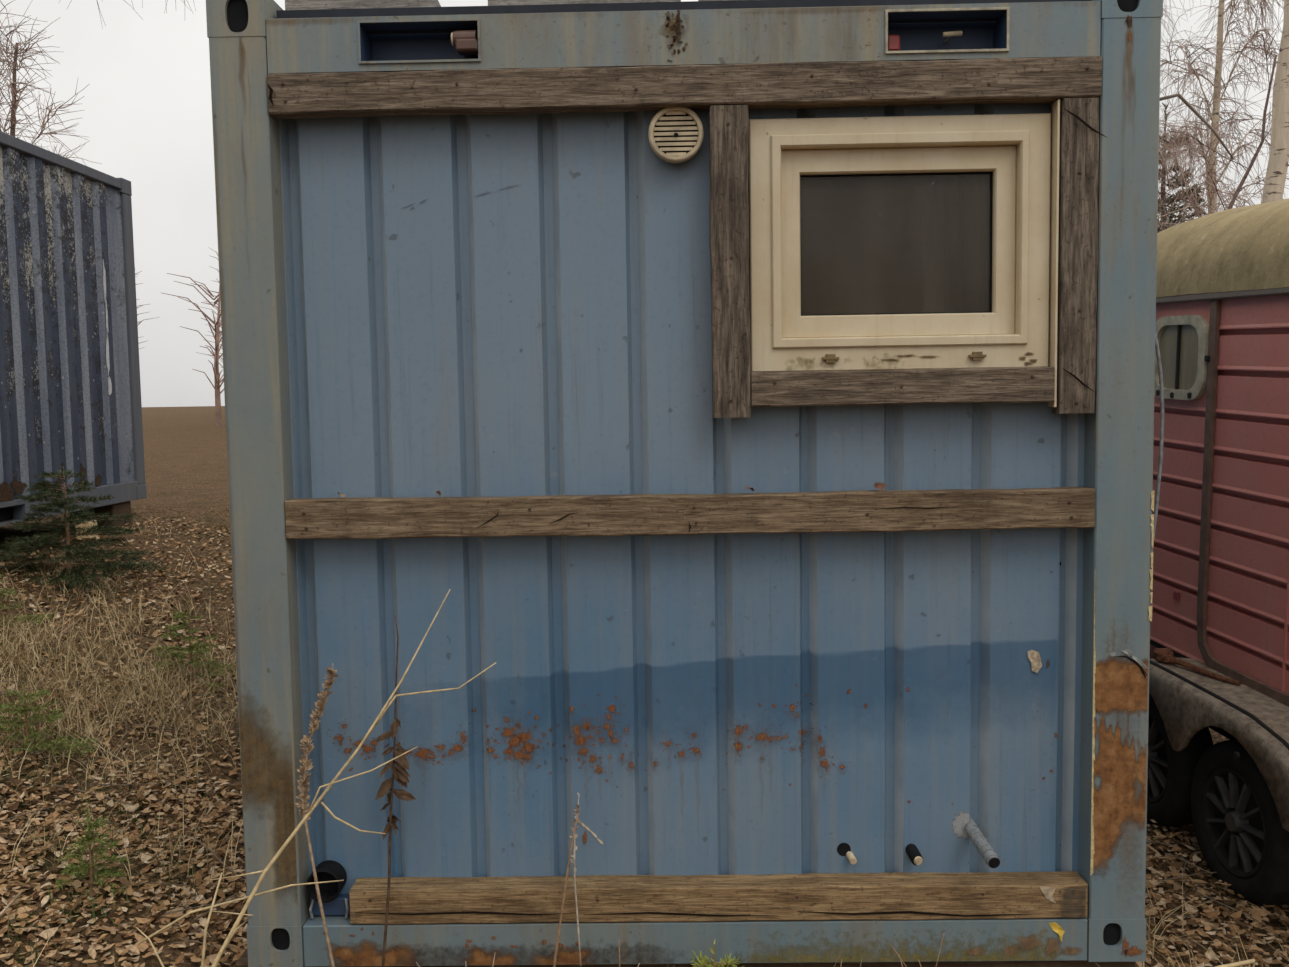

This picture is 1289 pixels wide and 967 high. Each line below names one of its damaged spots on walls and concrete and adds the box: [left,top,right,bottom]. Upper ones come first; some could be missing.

rust [665,10,688,62]
rust [240,711,297,886]
rust [326,693,702,788]
rust [726,684,851,784]
peeling [1090,585,1148,876]
rust [1093,648,1241,869]
rust [1121,936,1142,956]